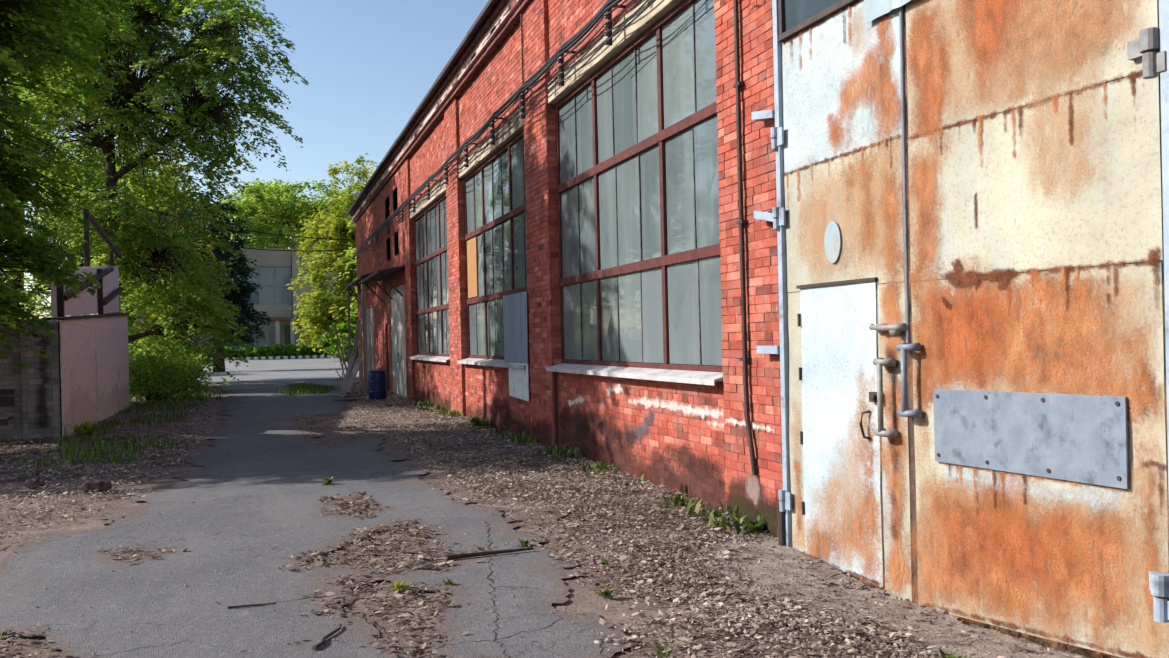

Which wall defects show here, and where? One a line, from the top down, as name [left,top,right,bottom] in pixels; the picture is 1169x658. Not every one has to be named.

corrosion [783,0,1169,658]
leakage [466,396,779,516]
leakage [607,384,774,431]